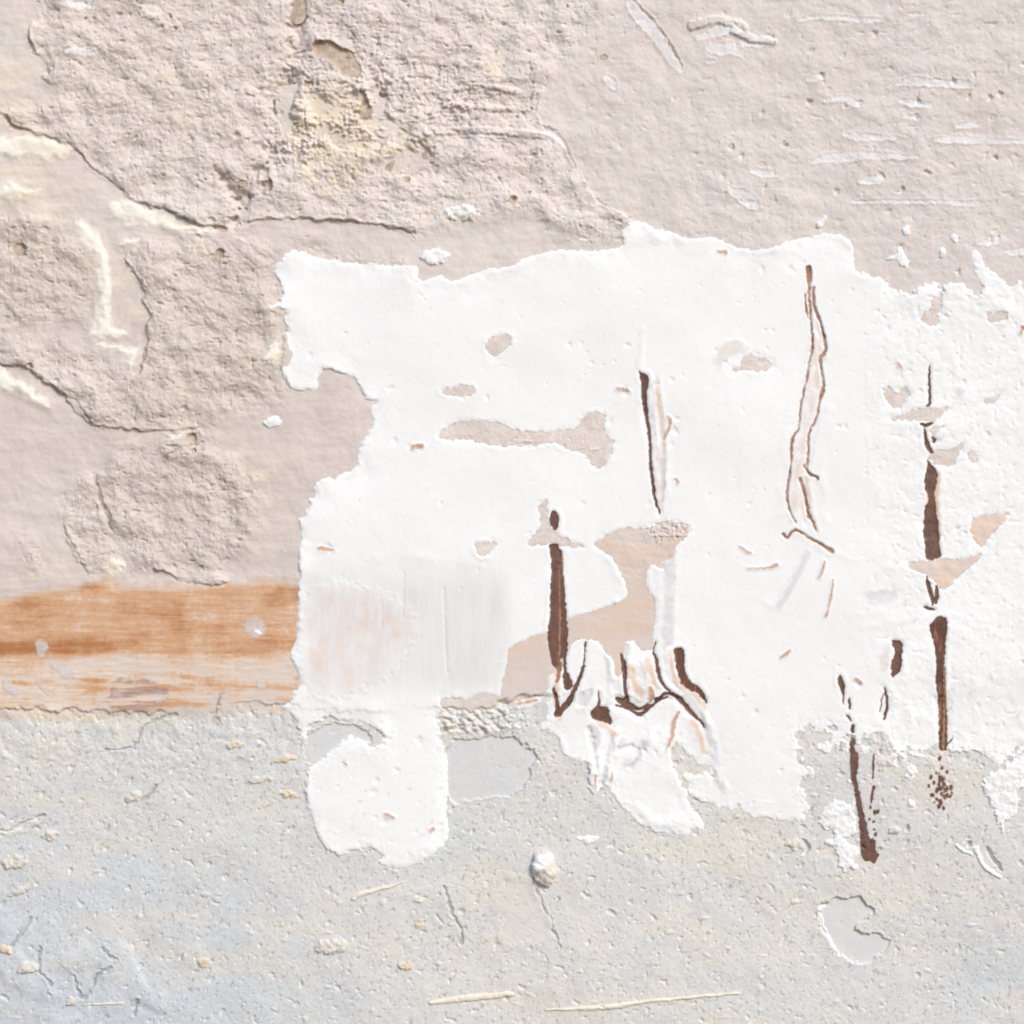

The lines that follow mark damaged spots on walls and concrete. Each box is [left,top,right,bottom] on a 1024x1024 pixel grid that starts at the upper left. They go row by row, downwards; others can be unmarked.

peeling [439,412,613,469]
crack [639,372,660,514]
crack [779,264,836,556]
rust [0,557,423,724]
peeling [501,500,688,708]
crack [547,511,707,728]
crack [920,365,953,810]
peeling [908,513,1009,590]
spalling [444,732,539,809]
crack [838,675,879,864]
rust [925,675,959,809]
spalling [816,892,894,967]